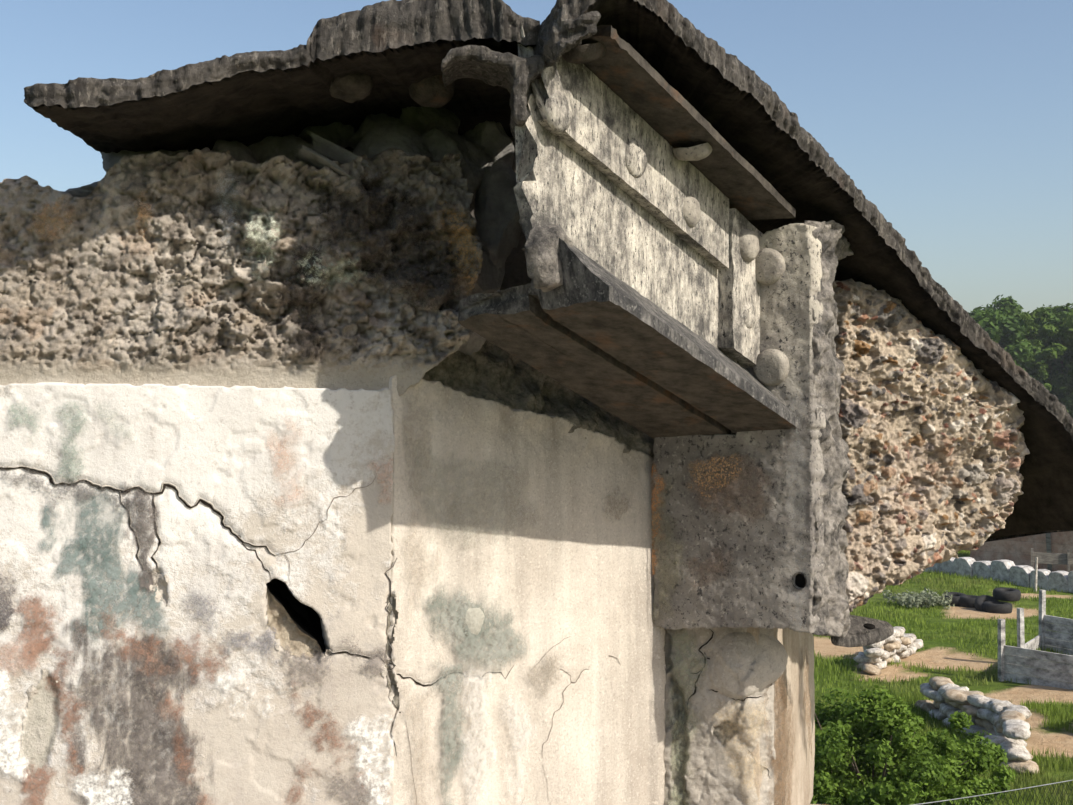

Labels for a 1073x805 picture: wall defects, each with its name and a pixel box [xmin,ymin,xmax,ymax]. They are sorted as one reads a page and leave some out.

spalling [833,278,1030,612]
crack [0,465,383,584]
rust [651,466,665,575]
water stain [0,402,206,805]
water stain [224,628,276,657]
spalling [266,579,401,713]
water stain [427,588,527,805]